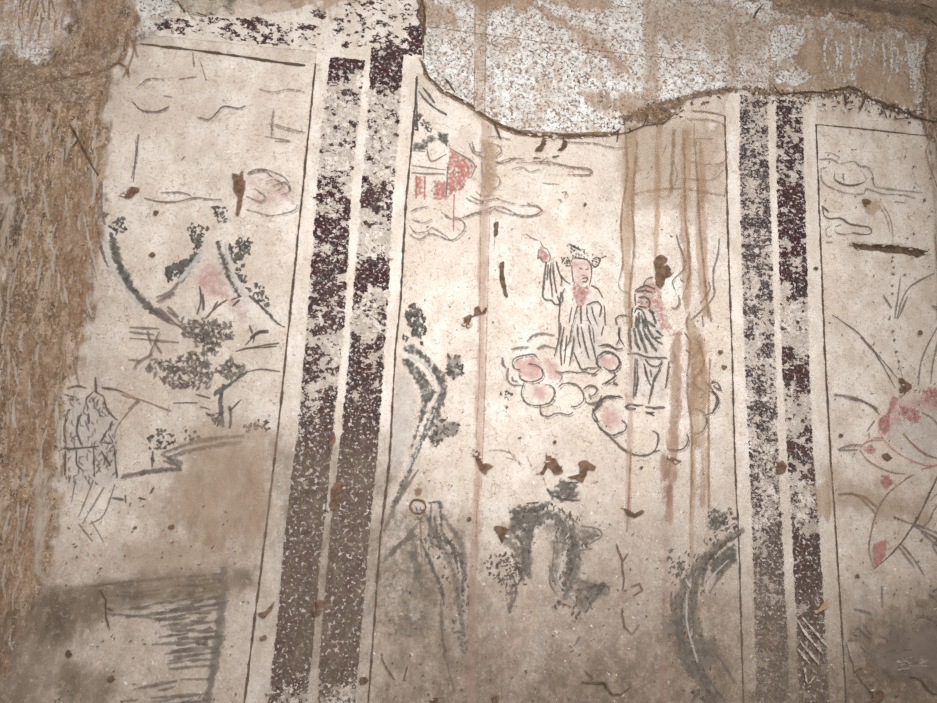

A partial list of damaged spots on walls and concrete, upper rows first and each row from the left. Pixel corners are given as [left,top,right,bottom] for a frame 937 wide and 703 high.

peeling [0,0,78,66]
peeling [126,0,235,44]
peeling [417,0,934,159]
water stain [618,125,639,352]
water stain [670,129,709,314]
water stain [687,340,711,515]